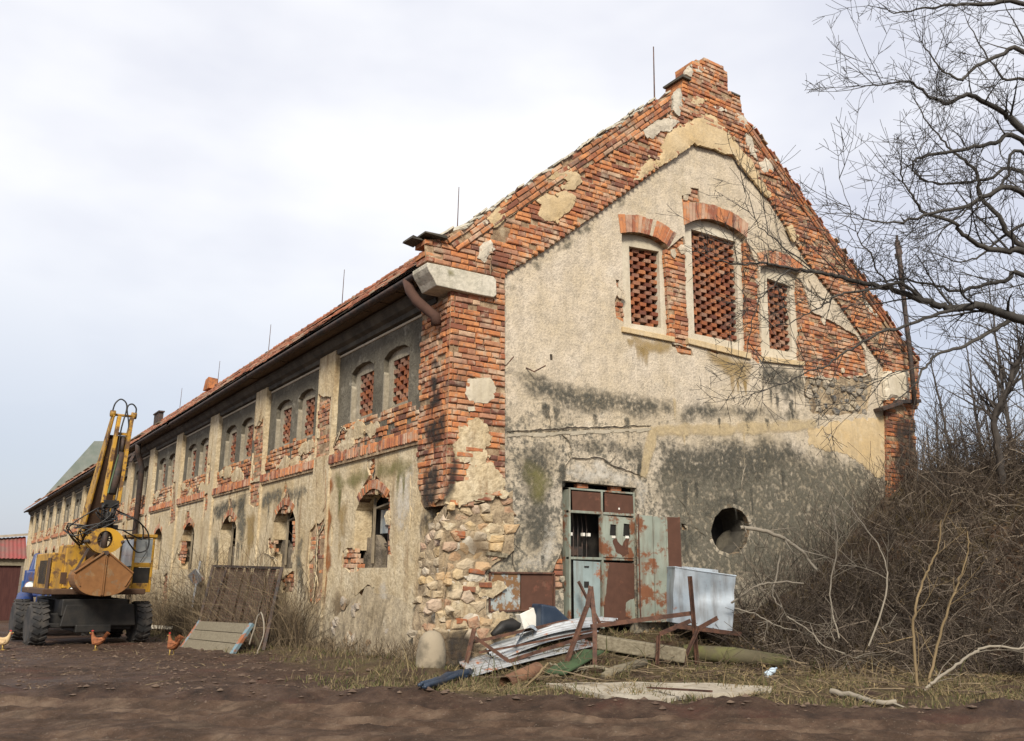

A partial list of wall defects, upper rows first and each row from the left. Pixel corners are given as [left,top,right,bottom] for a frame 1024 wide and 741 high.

flaking render [633,88,777,198]
flaking render [536,166,582,224]
spalling [276,395,380,469]
crack [507,411,651,477]
water stain [525,377,670,427]
water stain [683,405,769,428]
water stain [763,366,803,419]
spalling [794,279,886,478]
spalling [309,522,365,602]
spalling [407,406,520,670]
water stain [516,442,641,563]
water stain [658,440,879,586]